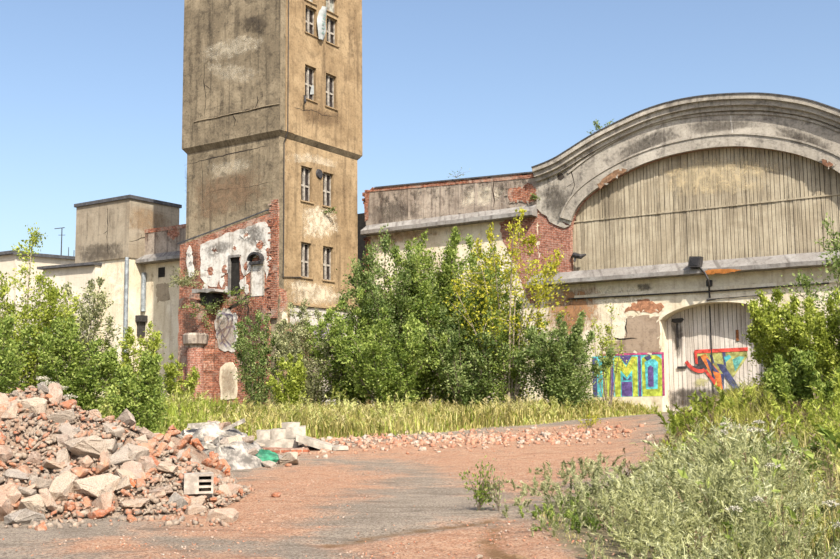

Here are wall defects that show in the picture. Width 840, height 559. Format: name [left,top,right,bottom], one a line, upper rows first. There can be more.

crack [203,63,271,125]
spalling [505,182,538,205]
spalling [595,166,629,189]
peeling [186,221,272,295]
spalling [497,213,541,309]
peeling [214,308,238,352]
spalling [607,297,664,355]
peeling [219,362,238,400]